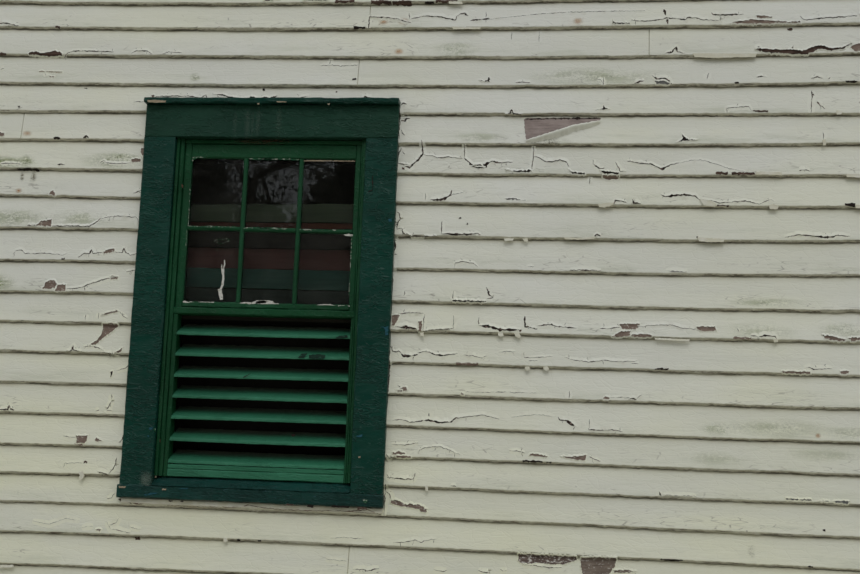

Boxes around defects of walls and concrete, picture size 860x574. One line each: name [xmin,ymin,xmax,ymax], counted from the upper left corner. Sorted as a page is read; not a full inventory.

peeling [693,42,860,58]
peeling [590,159,627,181]
peeling [41,246,136,293]
peeling [83,309,128,358]
peeling [474,317,521,339]
peeling [611,321,718,340]
crack [388,314,637,394]
crack [225,391,623,516]
peeling [389,498,429,514]
crack [393,536,437,547]
crack [326,534,380,574]
peeling [517,552,638,574]